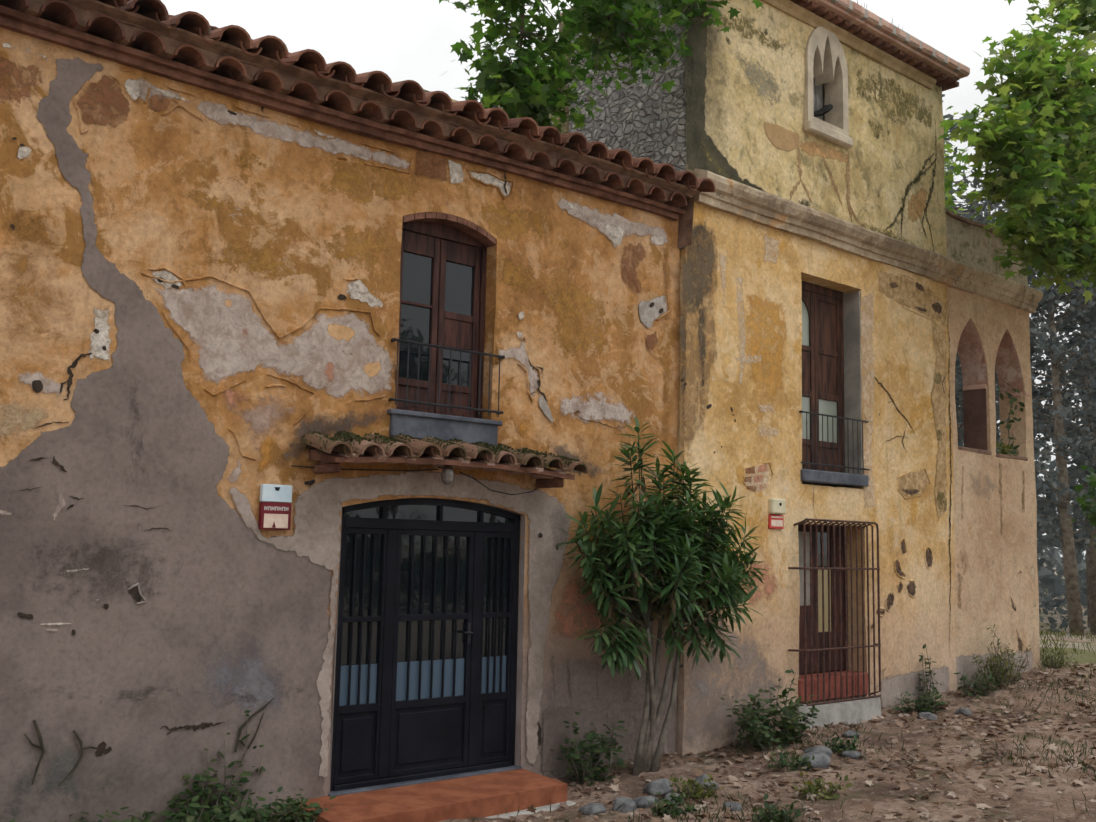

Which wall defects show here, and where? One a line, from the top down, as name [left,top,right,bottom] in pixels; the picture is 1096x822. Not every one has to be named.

peeling [73,74,130,134]
water stain [857,71,932,138]
crack [790,118,937,252]
crack [34,352,92,429]
peeling [142,266,397,433]
spalling [495,332,553,422]
spalling [639,293,670,328]
water stain [558,198,786,442]
crack [867,371,915,452]
crack [29,455,84,510]
peeling [867,538,916,631]
crack [161,722,225,735]